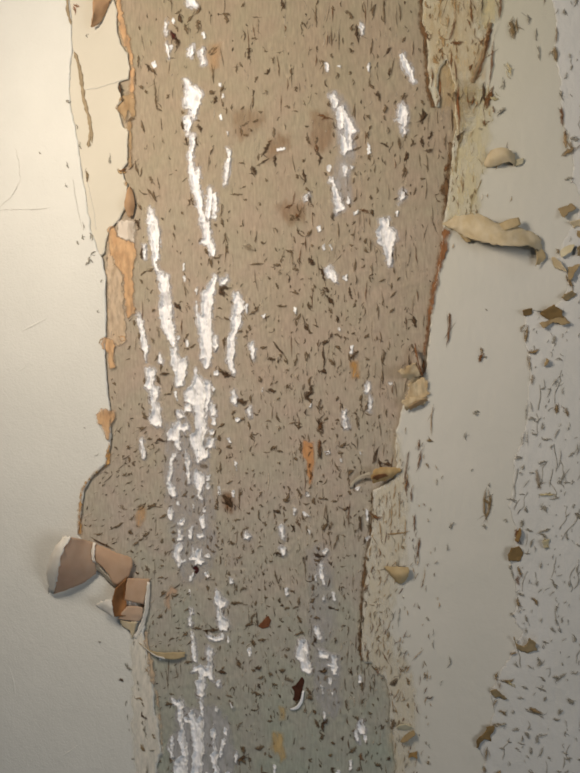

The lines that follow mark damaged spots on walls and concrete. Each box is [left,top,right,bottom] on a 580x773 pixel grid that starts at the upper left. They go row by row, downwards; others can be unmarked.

spalling [182,78,218,256]
spalling [327,91,359,215]
spalling [394,101,410,137]
spalling [399,53,417,84]
peeling [425,0,580,329]
spalling [324,265,348,283]
spalling [375,211,399,267]
spalling [135,205,249,596]
spalling [166,589,238,773]
leakage [174,707,234,773]
spalling [290,624,339,710]
spalling [349,453,437,771]